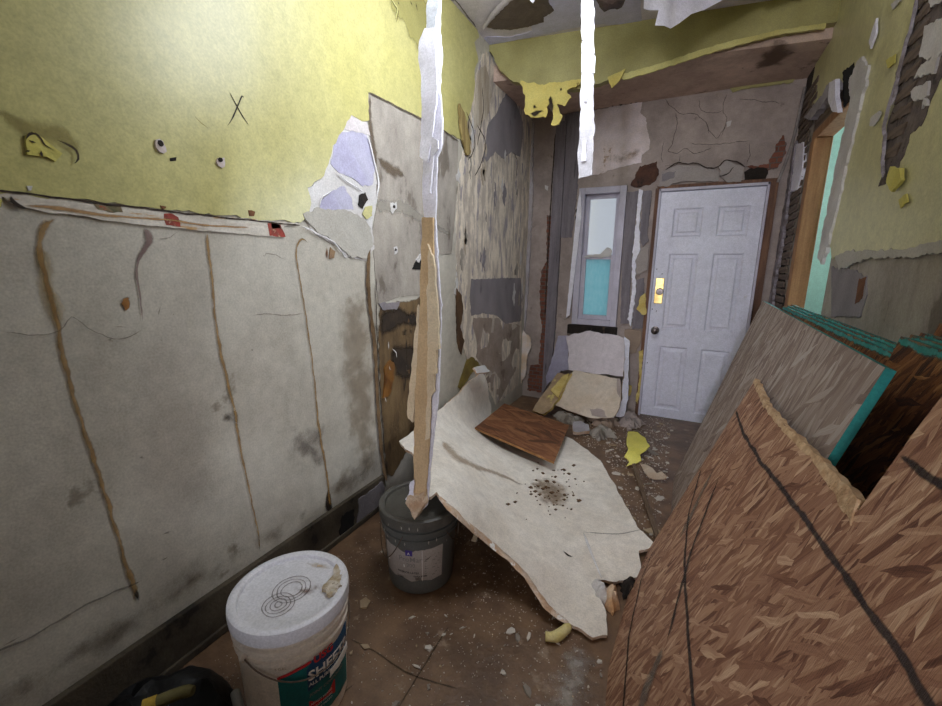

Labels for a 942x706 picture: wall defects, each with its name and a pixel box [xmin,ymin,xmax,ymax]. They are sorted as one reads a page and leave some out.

peeling [484,0,642,45]
peeling [608,69,626,88]
peeling [592,102,650,175]
crack [661,95,777,176]
spalling [869,0,942,208]
flaking render [303,27,581,392]
flaking render [831,240,942,318]
water stain [295,238,345,511]